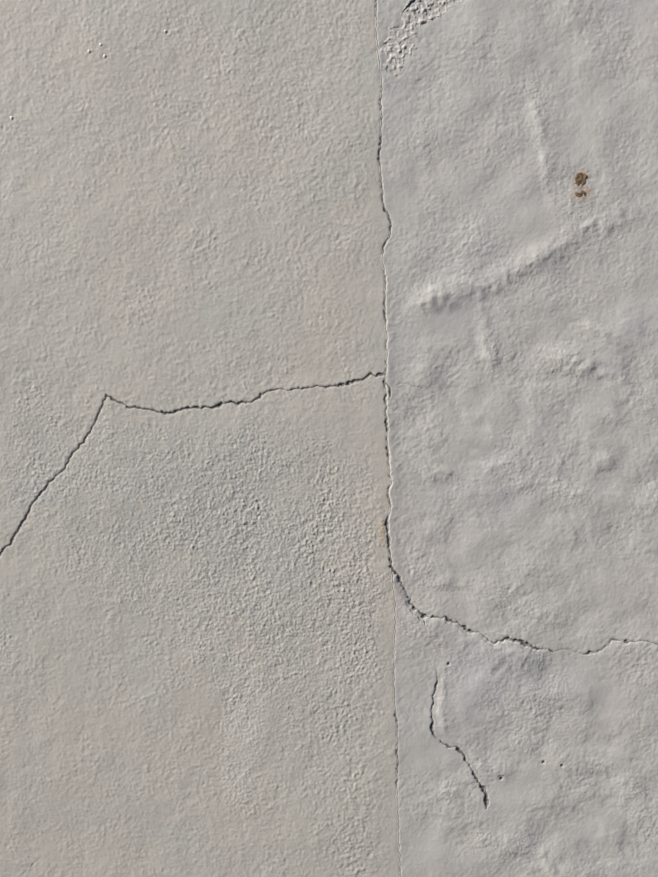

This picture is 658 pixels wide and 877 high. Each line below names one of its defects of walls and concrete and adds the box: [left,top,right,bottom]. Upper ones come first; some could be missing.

spalling [380,0,463,78]
rust [567,166,594,207]
crack [0,388,280,556]
crack [291,0,656,876]